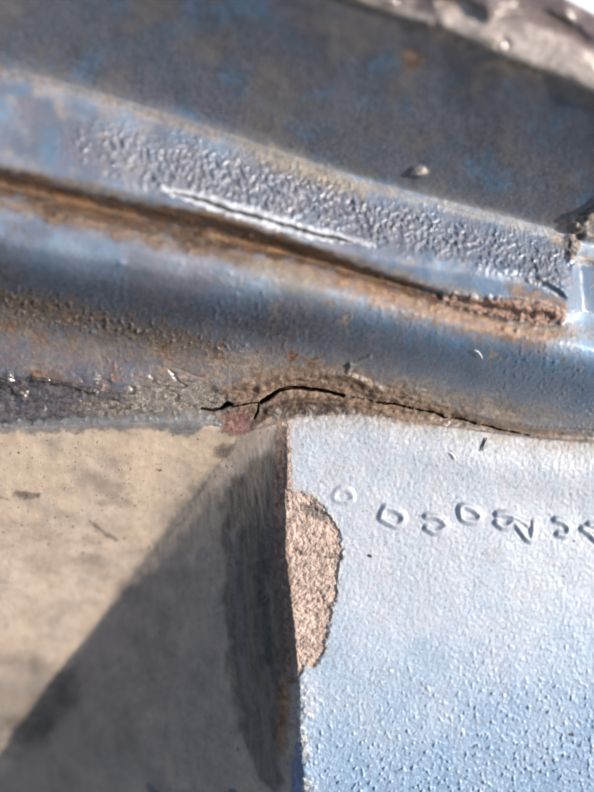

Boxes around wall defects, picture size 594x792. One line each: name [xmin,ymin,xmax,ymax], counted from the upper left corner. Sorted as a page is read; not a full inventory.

corrosion [0,169,568,354]
crack [200,386,539,437]
peeling [280,422,345,792]